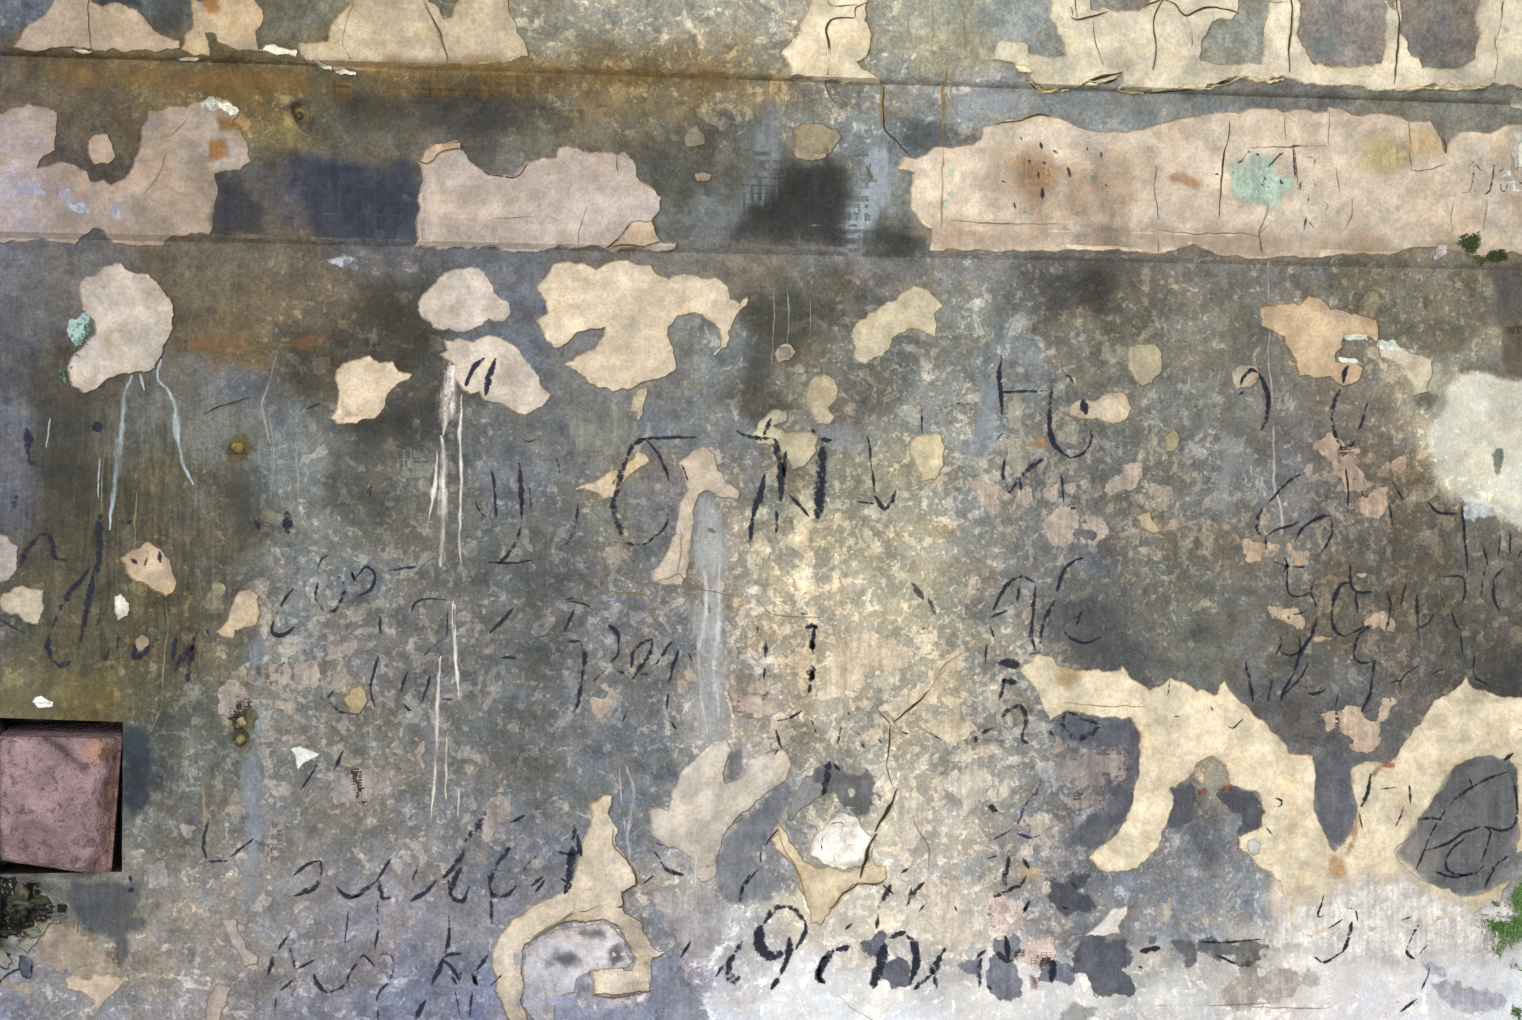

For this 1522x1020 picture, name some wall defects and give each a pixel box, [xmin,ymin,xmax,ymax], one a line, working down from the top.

peeling [992,0,1522,94]
leakage [201,97,239,115]
peeling [896,107,1522,260]
peeling [0,101,251,394]
peeling [414,140,749,500]
leakage [1344,334,1414,353]
leakage [1504,327,1522,376]
leakage [1272,427,1283,532]
leakage [1463,503,1520,531]
leakage [1492,448,1504,475]
spalling [1020,654,1522,938]
spalling [491,739,887,1020]